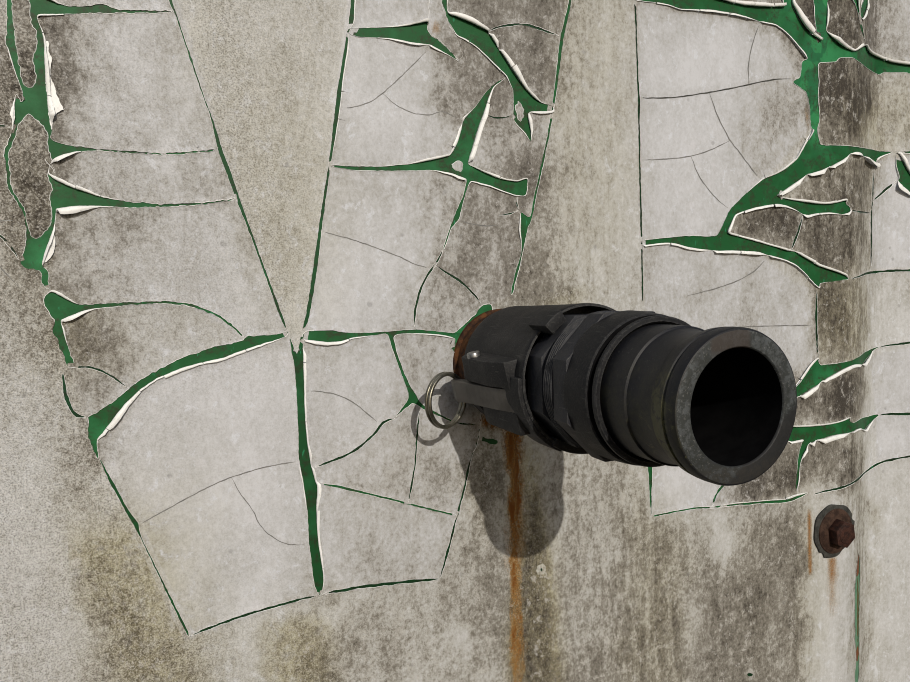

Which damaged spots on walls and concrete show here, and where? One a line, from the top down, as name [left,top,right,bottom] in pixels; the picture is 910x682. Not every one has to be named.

peeling [634,0,910,294]
peeling [0,0,560,600]
corrosion [502,430,524,682]
peeling [644,467,656,519]
peeling [787,410,880,492]
peeling [794,342,880,404]